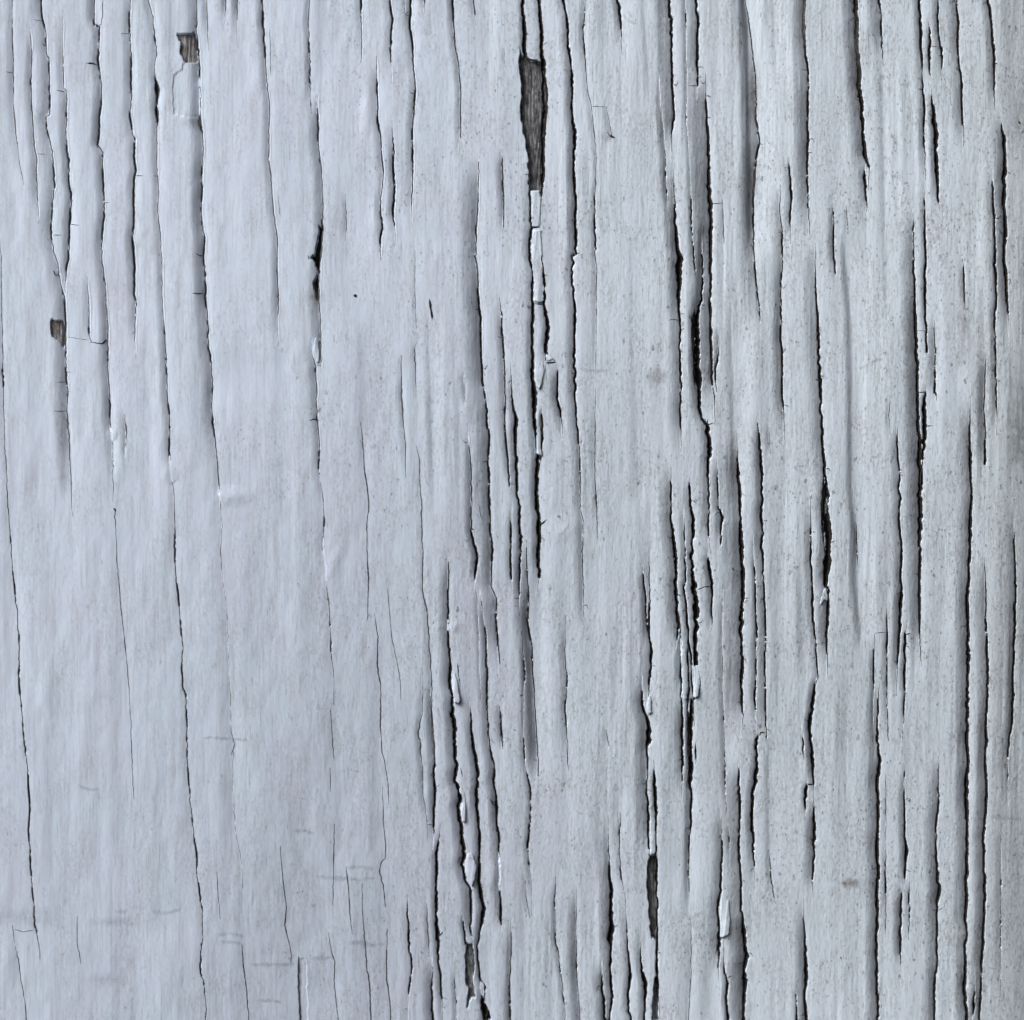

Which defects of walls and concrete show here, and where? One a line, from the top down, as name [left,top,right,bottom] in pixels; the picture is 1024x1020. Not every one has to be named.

peeling [172,34,201,117]
peeling [519,53,546,194]
peeling [51,320,65,348]
crack [307,0,347,537]
crack [8,0,281,1020]
crack [328,0,883,1020]
crack [872,0,1018,1020]
crack [0,248,40,1020]
crack [326,585,335,786]
crack [280,846,301,1020]
peeling [646,856,657,940]